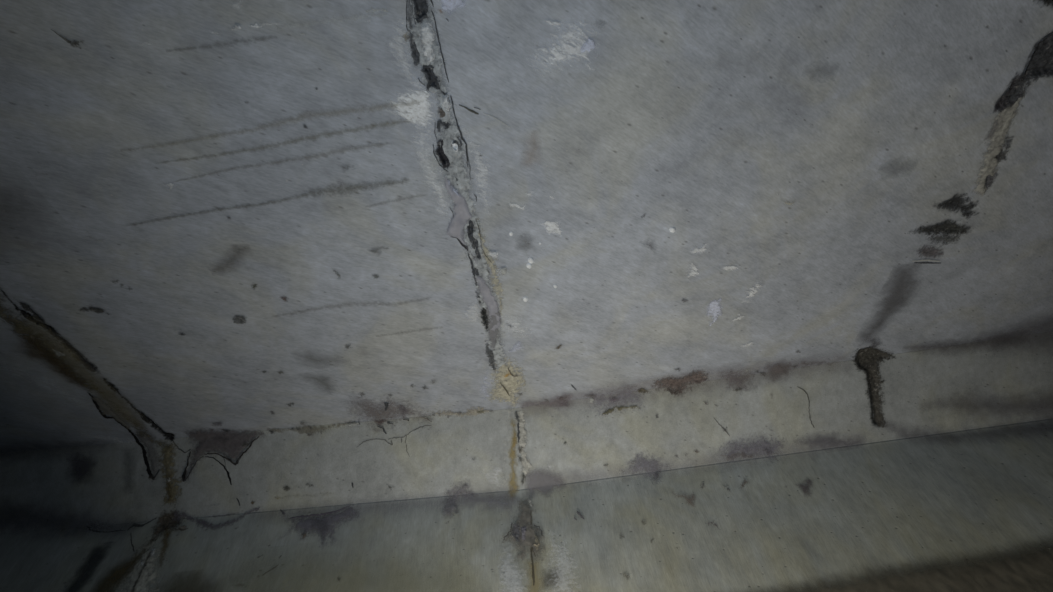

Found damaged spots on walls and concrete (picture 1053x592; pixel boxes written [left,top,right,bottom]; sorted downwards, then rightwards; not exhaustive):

spalling [994,31,1053,112]
crack [406,0,511,286]
spalling [985,137,1012,189]
crack [89,393,160,480]
crack [173,441,240,506]
peeling [182,393,489,482]